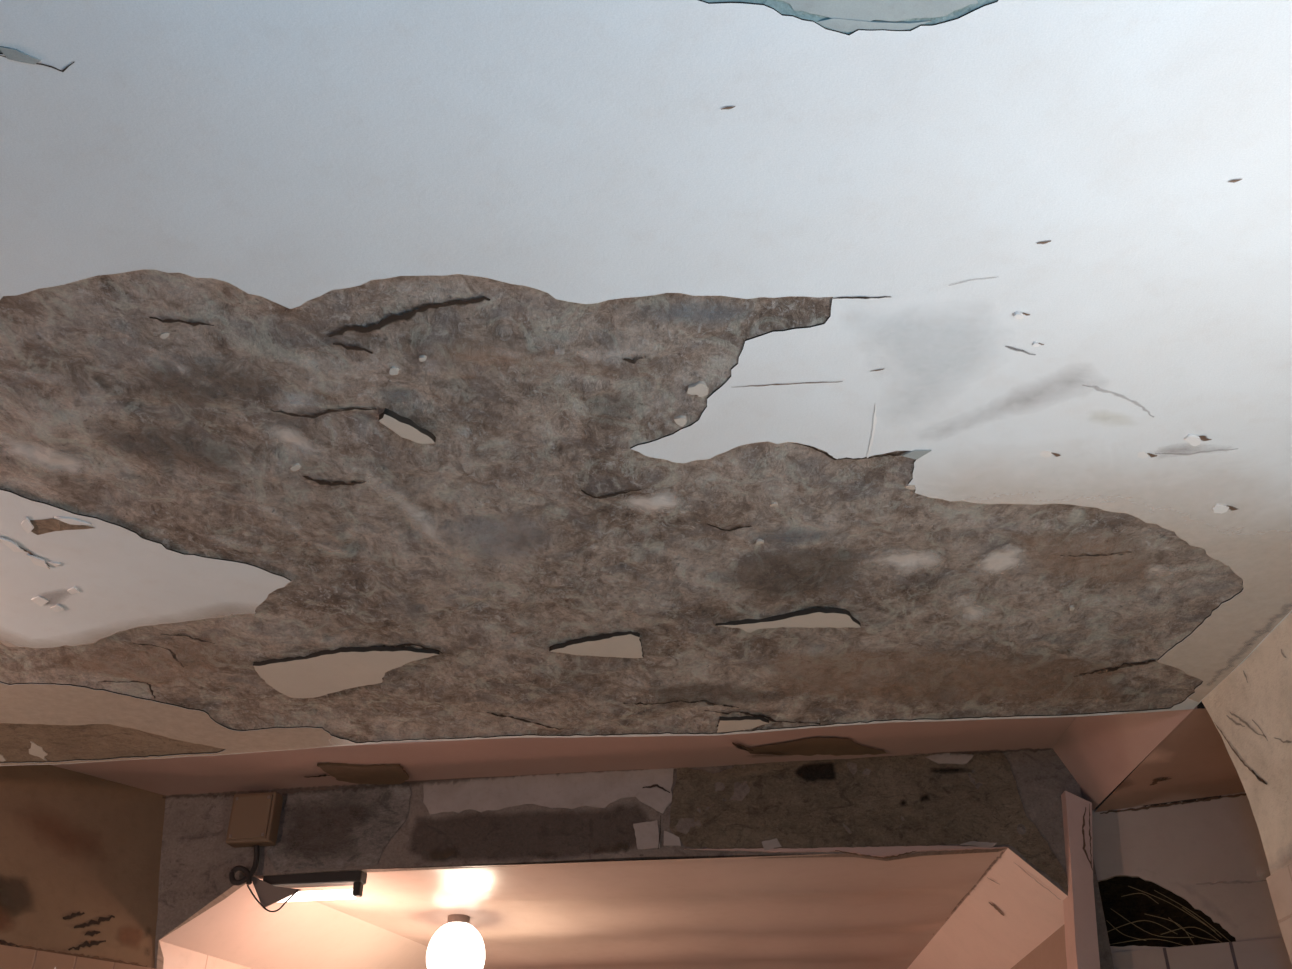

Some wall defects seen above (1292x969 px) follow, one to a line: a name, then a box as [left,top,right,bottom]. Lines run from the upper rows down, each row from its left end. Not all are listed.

flaking render [703,0,997,34]
flaking render [0,46,74,72]
flaking render [0,269,1243,892]